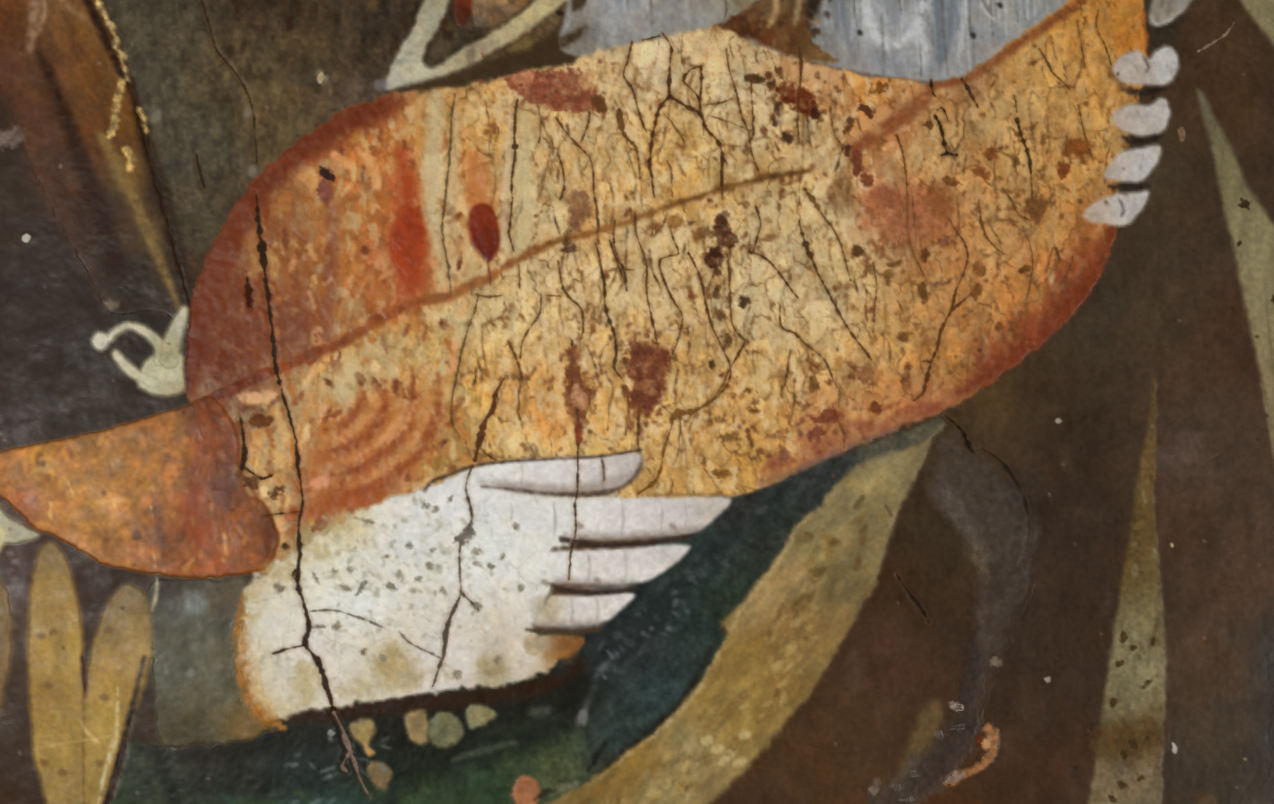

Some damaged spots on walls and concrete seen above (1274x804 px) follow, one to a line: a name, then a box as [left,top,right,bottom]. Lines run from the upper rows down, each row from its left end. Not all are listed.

crack [195,153,207,190]
crack [199,0,258,163]
crack [894,133,909,196]
crack [929,77,979,158]
crack [1038,9,1112,164]
crack [911,94,1055,540]
crack [239,0,878,796]